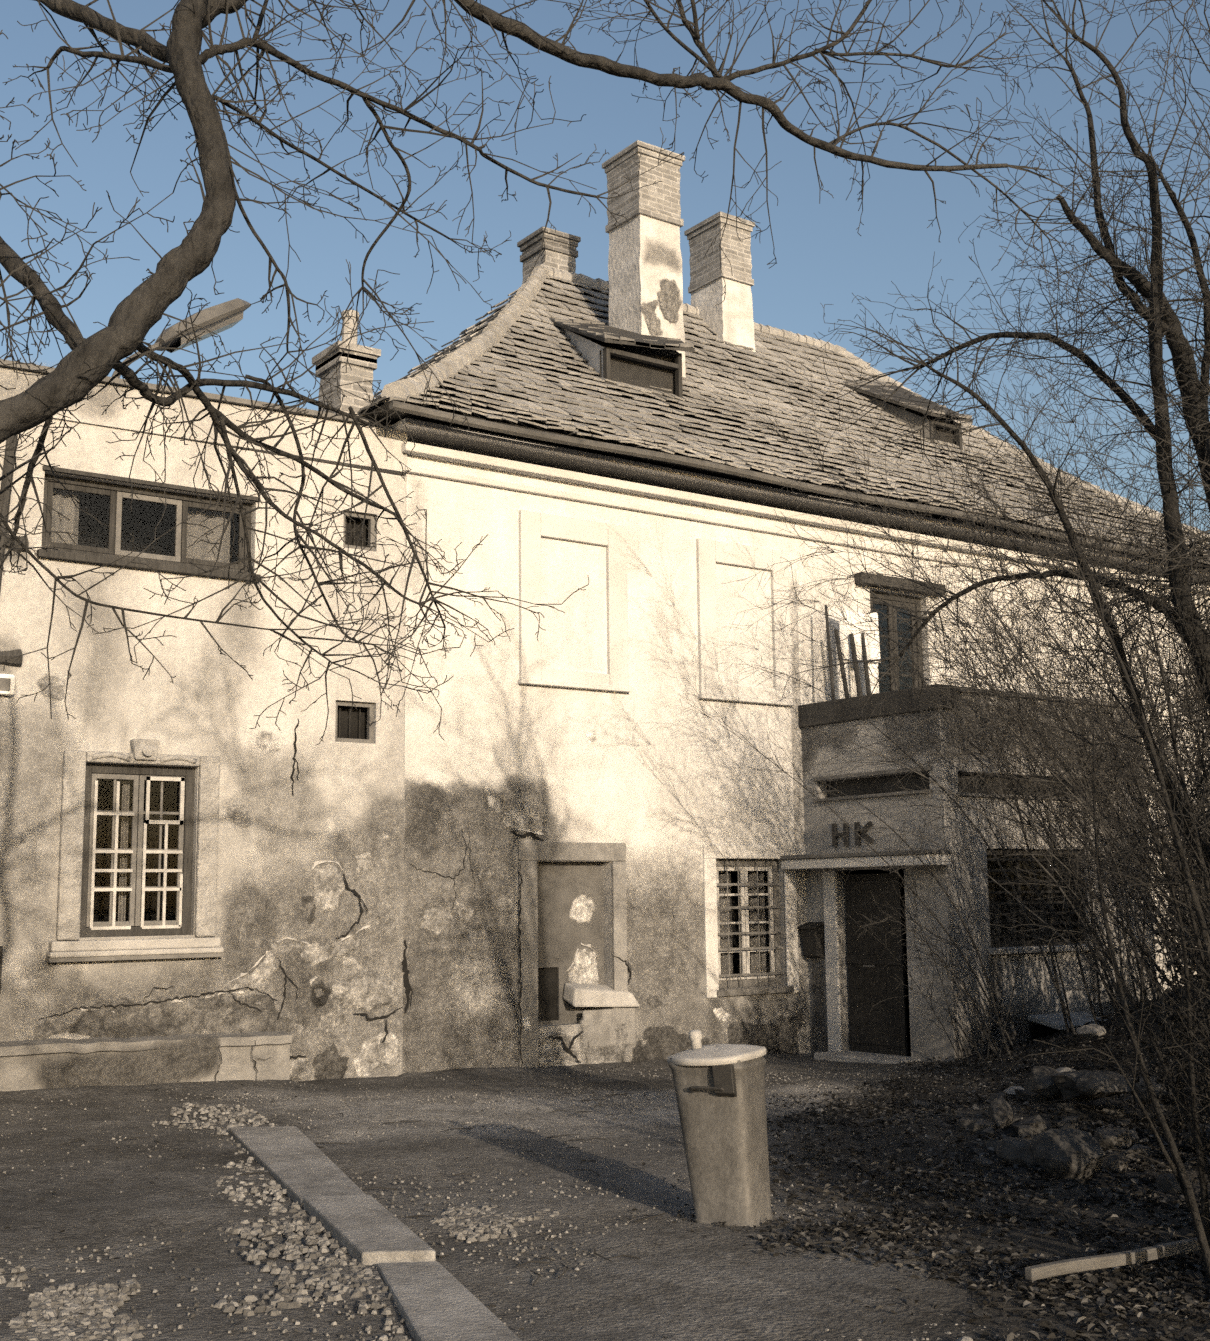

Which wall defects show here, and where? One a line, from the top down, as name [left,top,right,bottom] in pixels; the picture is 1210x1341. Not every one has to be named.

flaking render [641,279,682,336]
crack [290,719,300,796]
flaking render [487,794,544,836]
crack [39,960,307,1081]
flaking render [35,925,400,1081]
damp [39,780,557,1089]
flaking render [302,896,315,924]
crack [336,874,368,938]
crack [354,940,413,1043]
flaking render [570,895,594,923]
flaking render [567,942,599,984]